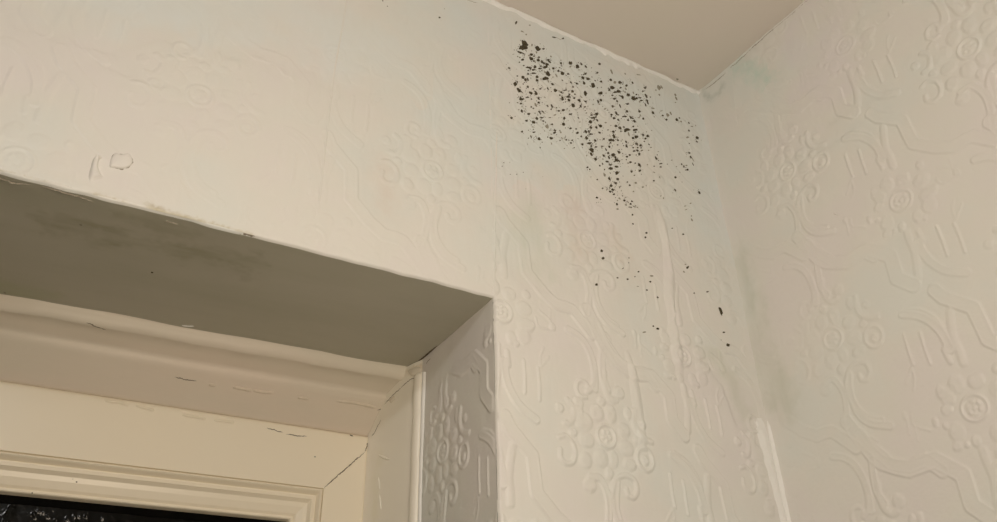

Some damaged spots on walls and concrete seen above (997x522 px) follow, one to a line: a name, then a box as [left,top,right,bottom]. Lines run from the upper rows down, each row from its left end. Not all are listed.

leakage [379,0,886,431]